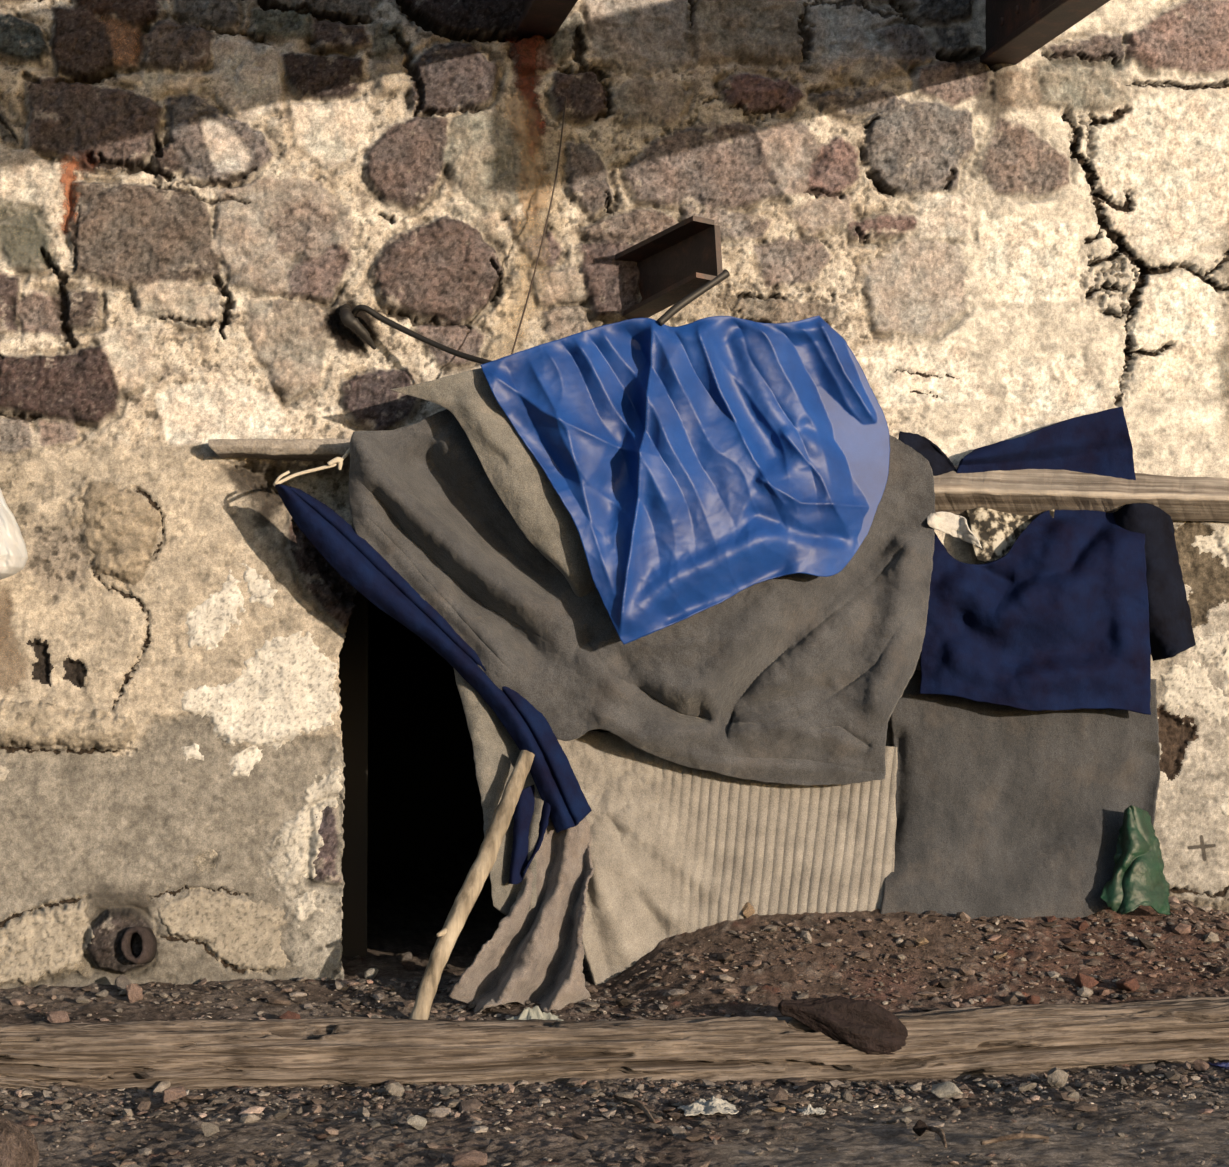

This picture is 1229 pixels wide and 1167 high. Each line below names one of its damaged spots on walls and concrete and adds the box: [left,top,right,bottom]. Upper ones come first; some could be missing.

rust [503,30,546,162]
rust [60,152,100,233]
crack [1061,83,1229,405]
crack [136,488,164,559]
spalling [26,638,87,688]
crack [93,571,151,710]
flaking render [185,563,278,651]
flaking render [181,631,340,777]
flaking render [1157,521,1229,781]
crack [0,896,87,927]
crack [161,935,270,974]
crack [1169,886,1229,898]